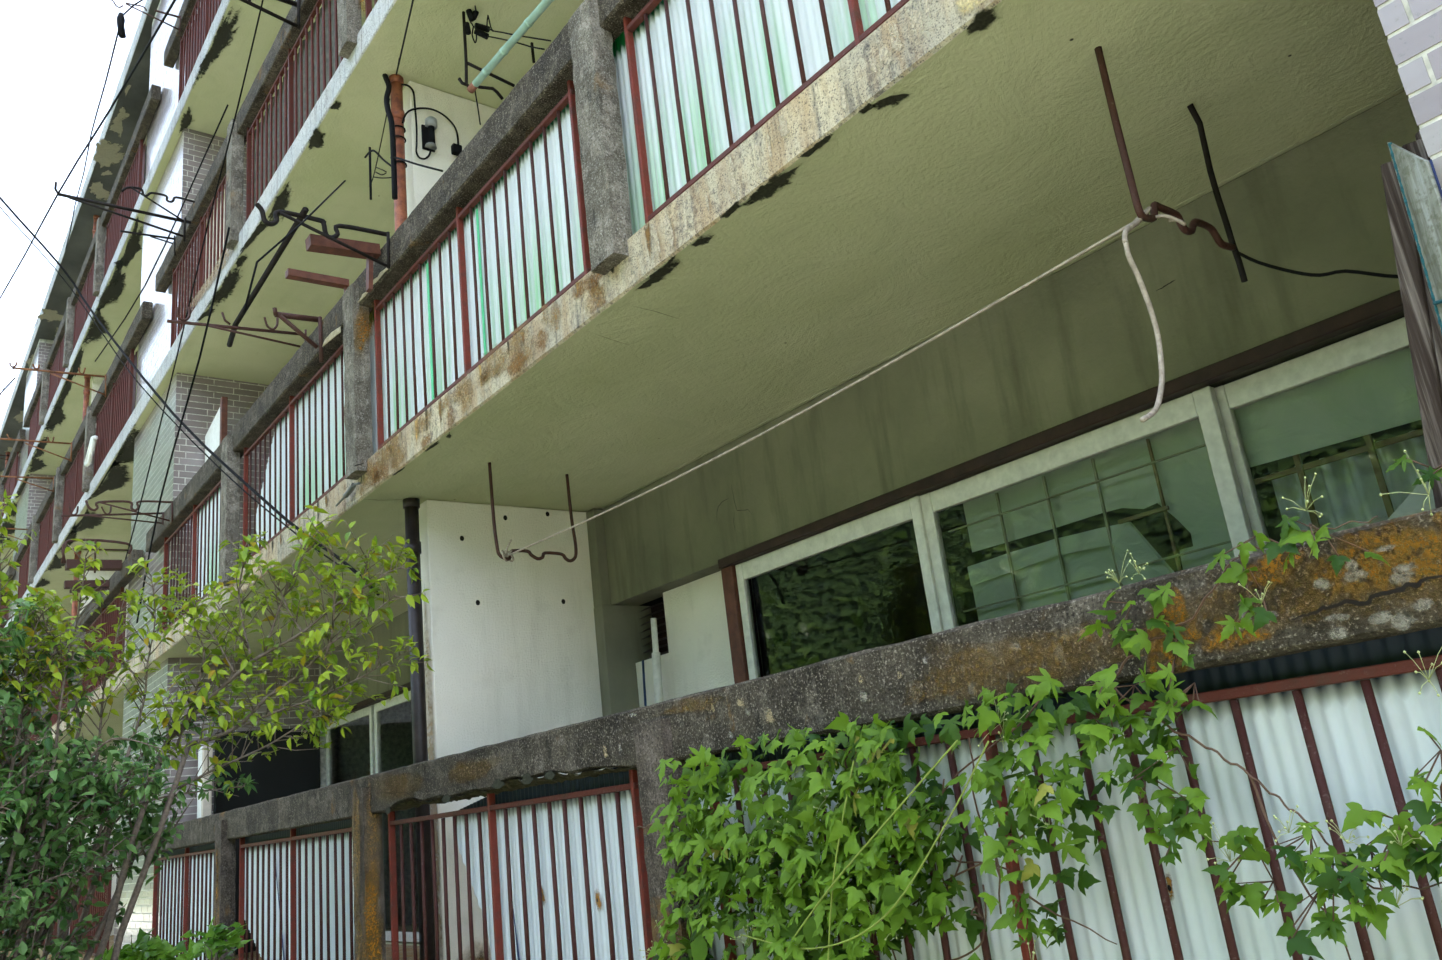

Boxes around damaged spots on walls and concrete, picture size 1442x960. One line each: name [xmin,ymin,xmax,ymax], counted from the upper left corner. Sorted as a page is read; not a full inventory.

peeling [869,0,931,72]
water stain [967,7,996,35]
water stain [859,94,909,114]
water stain [720,134,833,218]
water stain [636,222,679,290]
peeling [649,215,688,256]
water stain [692,235,713,247]
water stain [399,398,452,452]
crack [1291,575,1442,620]